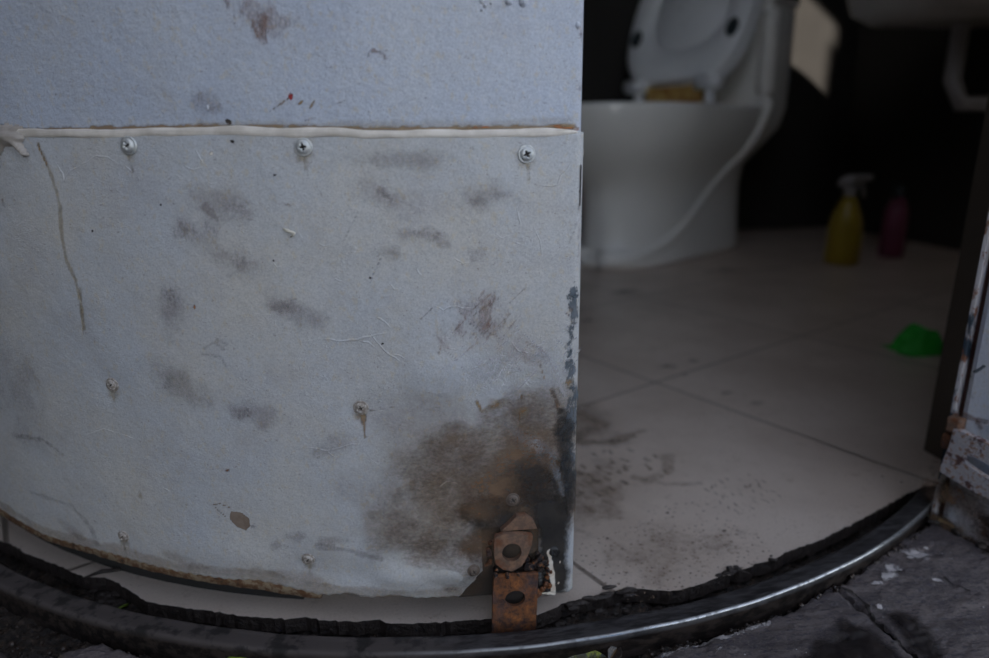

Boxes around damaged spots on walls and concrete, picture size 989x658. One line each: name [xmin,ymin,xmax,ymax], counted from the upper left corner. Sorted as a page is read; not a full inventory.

leakage [551,390,575,512]